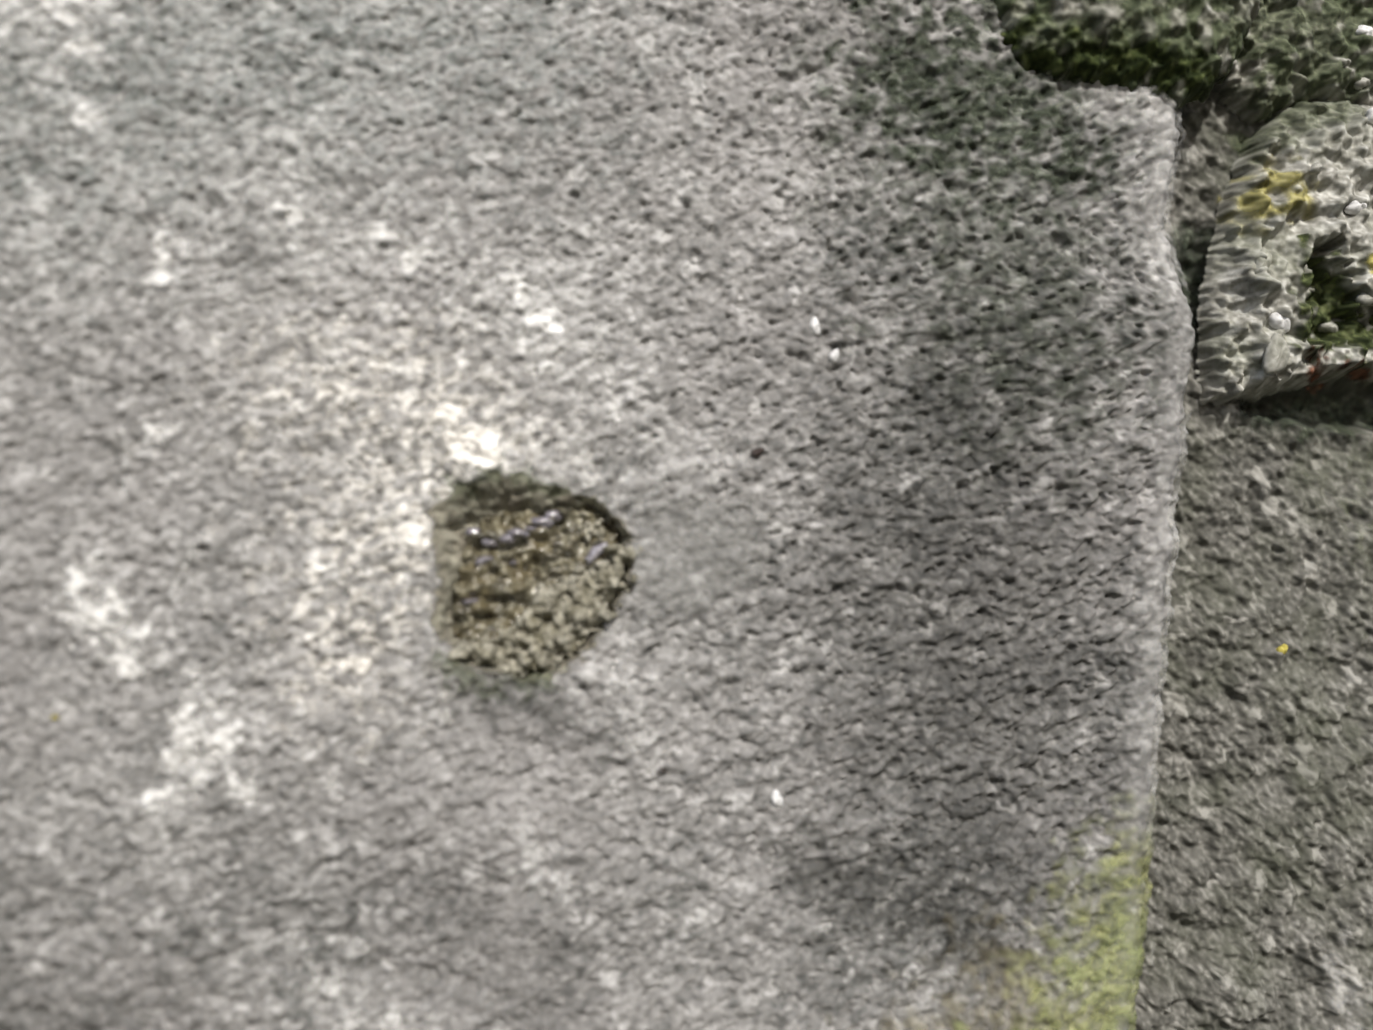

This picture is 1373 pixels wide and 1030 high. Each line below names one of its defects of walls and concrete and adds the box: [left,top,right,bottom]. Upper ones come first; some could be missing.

water stain [850,0,871,10]
water stain [854,0,1161,199]
efflorescence [307,978,340,996]
efflorescence [385,1014,401,1027]